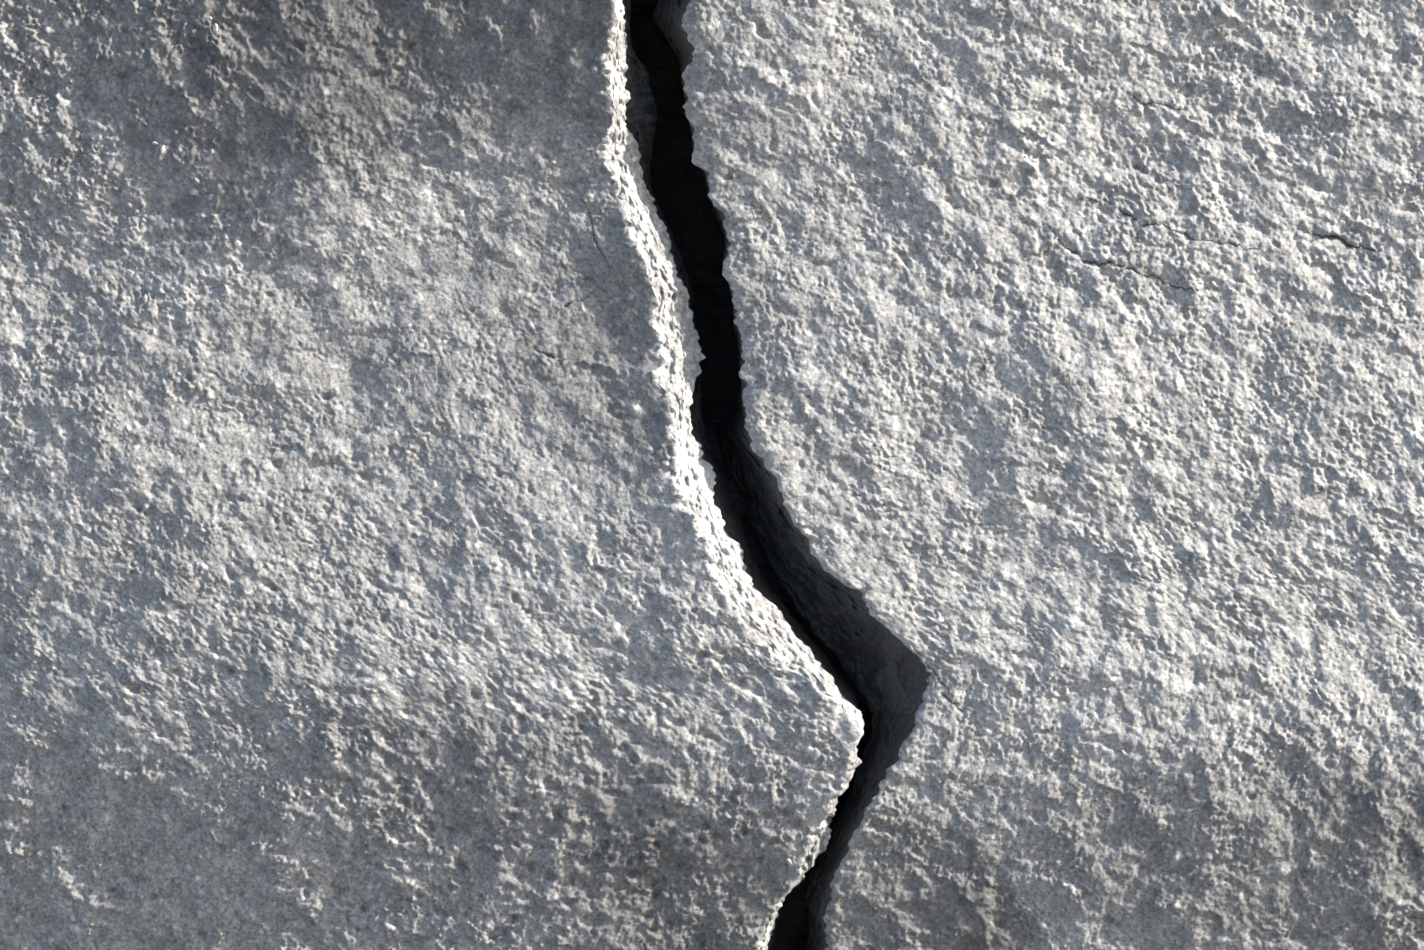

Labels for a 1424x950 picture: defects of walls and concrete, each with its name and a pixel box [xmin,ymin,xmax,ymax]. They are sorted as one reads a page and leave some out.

crack [519,346,568,361]
crack [577,0,964,950]